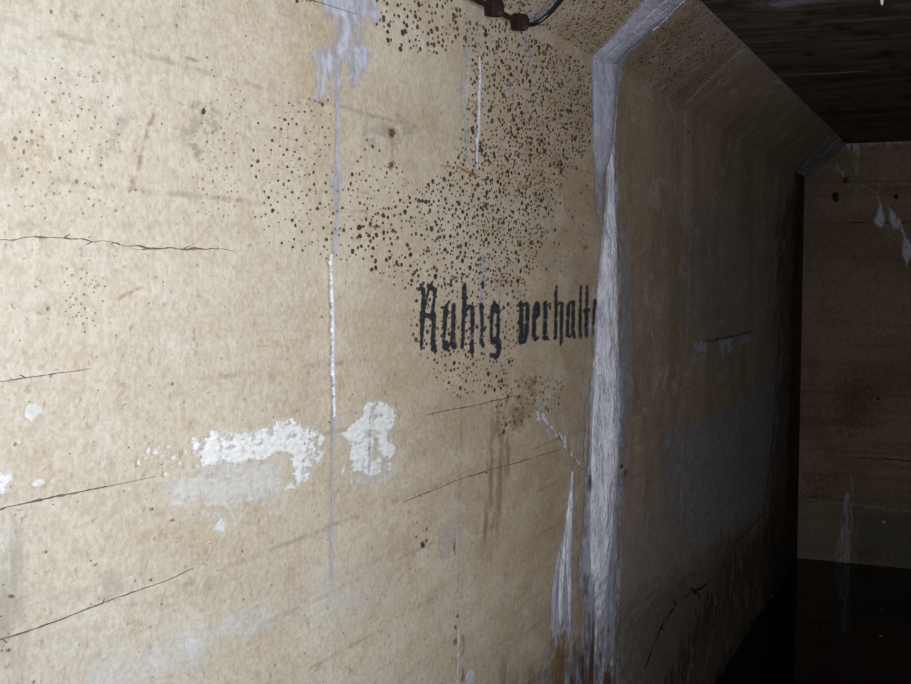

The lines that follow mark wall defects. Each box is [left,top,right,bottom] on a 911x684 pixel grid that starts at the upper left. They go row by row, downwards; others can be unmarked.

water stain [314,0,379,199]
crack [0,234,231,251]
water stain [874,204,911,265]
water stain [329,225,338,434]
peeling [0,470,12,494]
crack [0,476,156,511]
peeling [137,417,325,533]
peeling [341,401,396,484]
crack [0,568,193,643]
crack [644,513,765,669]